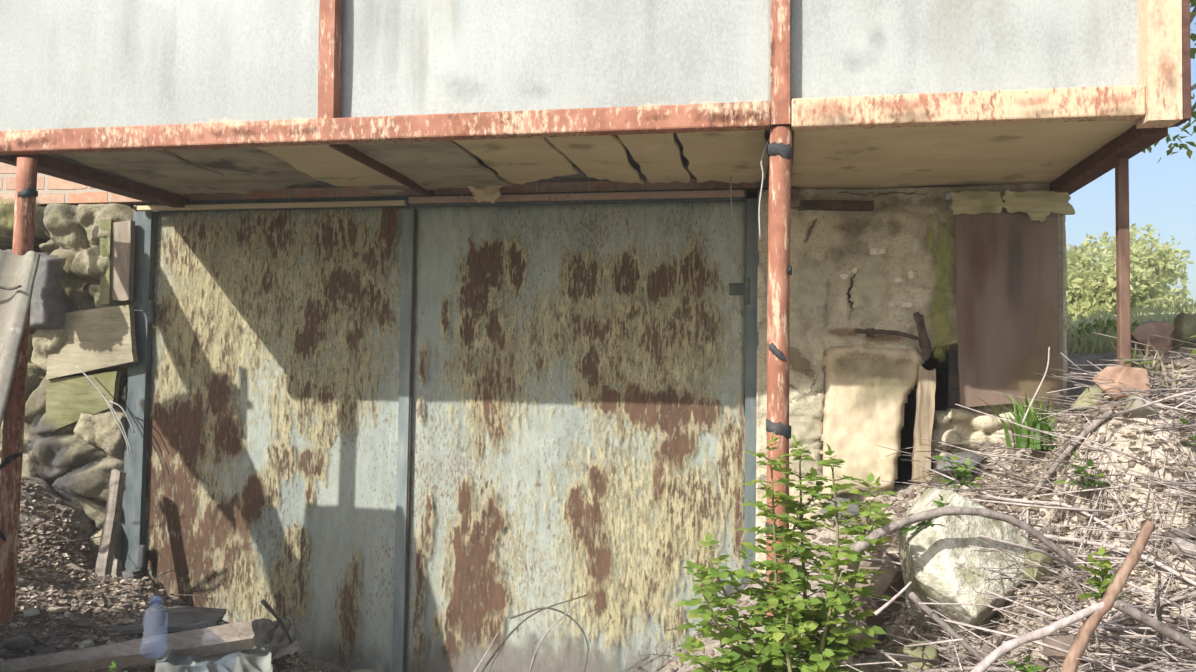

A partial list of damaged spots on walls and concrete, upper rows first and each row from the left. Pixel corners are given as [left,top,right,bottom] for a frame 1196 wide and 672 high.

rust [877,98,928,112]
crack [826,274,863,325]
rust [143,207,399,625]
rust [410,211,745,670]
rust [329,547,363,670]